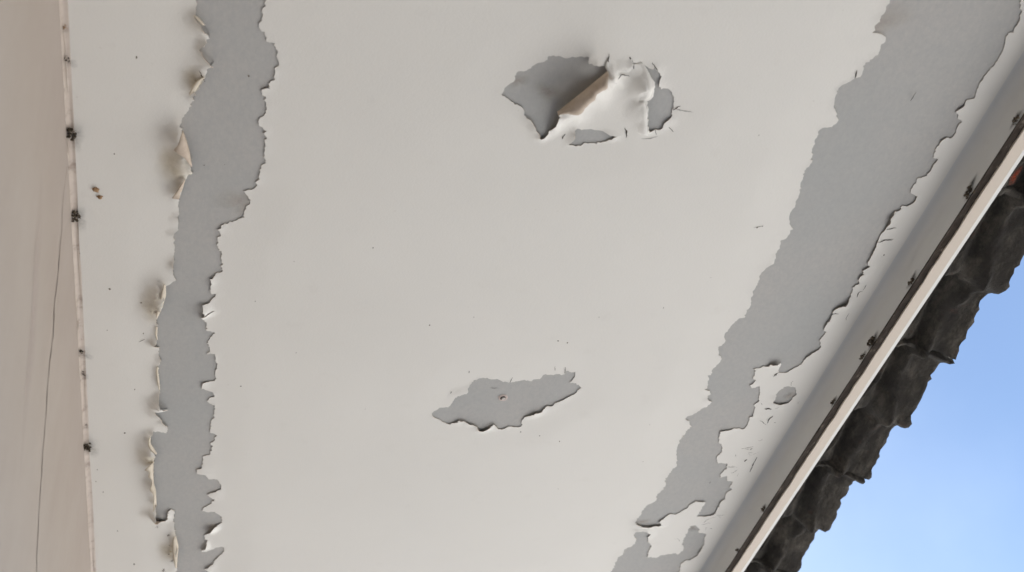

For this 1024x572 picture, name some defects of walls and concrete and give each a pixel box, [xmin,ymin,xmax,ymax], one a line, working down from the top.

peeling [133,0,279,572]
peeling [432,371,581,433]
peeling [502,52,674,145]
peeling [611,0,1022,572]